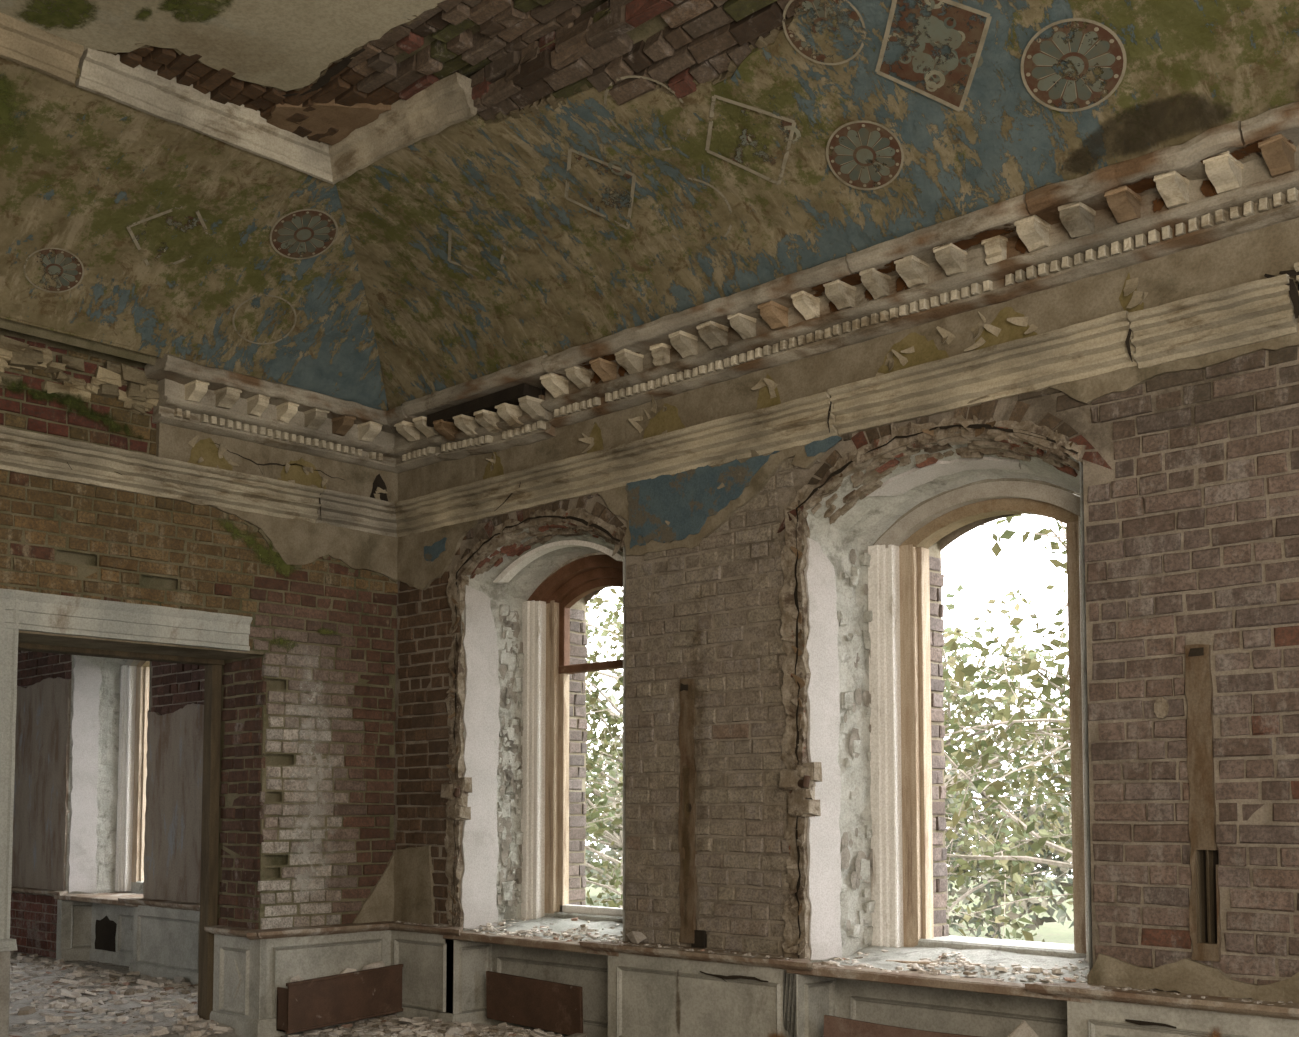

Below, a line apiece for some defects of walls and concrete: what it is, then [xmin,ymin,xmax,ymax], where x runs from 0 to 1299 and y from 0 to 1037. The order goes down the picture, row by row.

flaking render [98,0,816,146]
crack [1264,270,1299,319]
peeling [751,374,781,410]
peeling [188,435,239,471]
peeling [277,458,328,489]
peeling [370,474,388,501]
flaking render [444,415,1086,783]
flaking render [444,799,465,929]
flaking render [781,789,812,961]